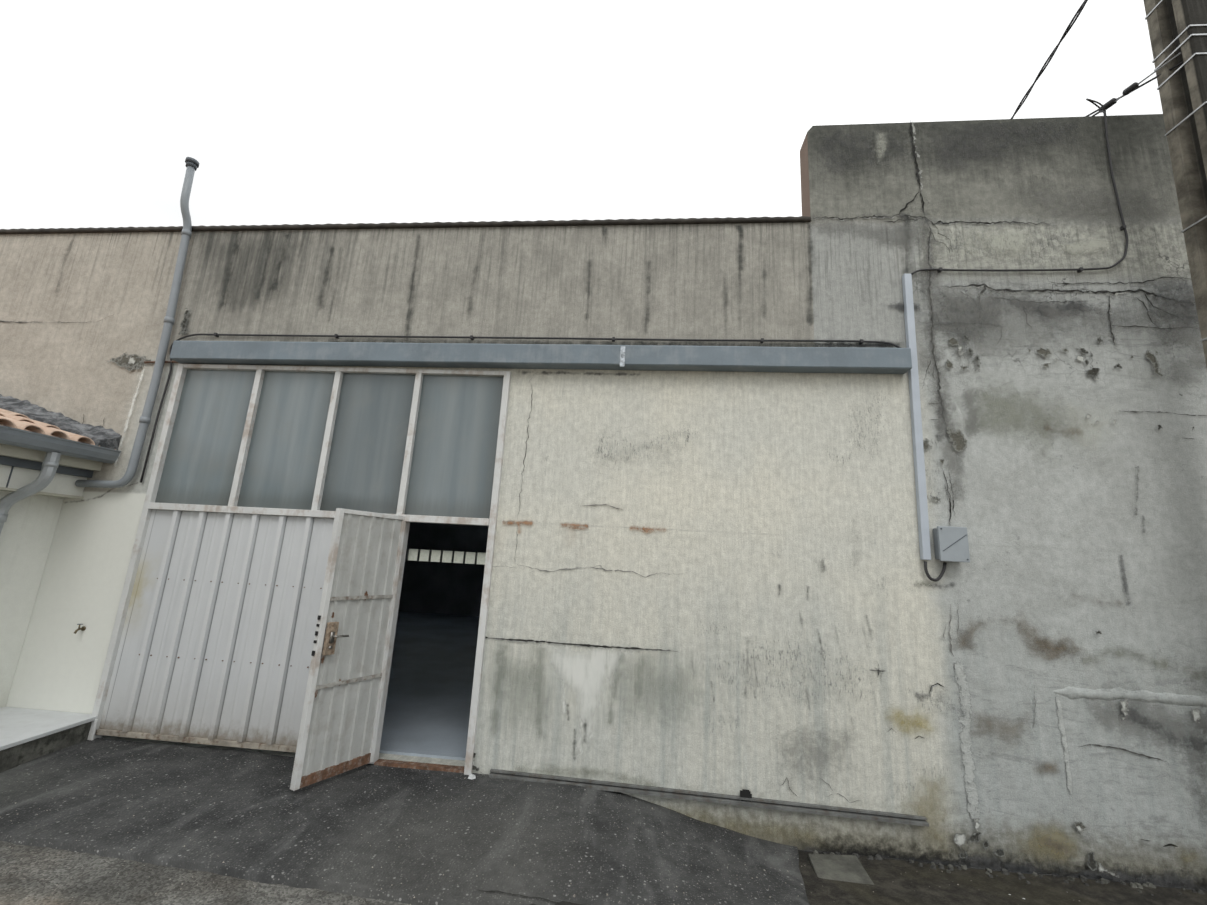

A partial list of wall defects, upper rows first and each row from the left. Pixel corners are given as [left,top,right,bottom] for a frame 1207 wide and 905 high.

crack [816,119,1196,432]
leakage [329,273,510,344]
leakage [1010,300,1089,315]
spalling [105,352,151,371]
spalling [946,335,981,372]
spalling [1029,336,1163,380]
crack [1122,411,1205,439]
crack [492,381,666,577]
crack [943,471,955,525]
crack [929,603,959,694]
leakage [1033,640,1066,657]
leakage [553,649,621,750]